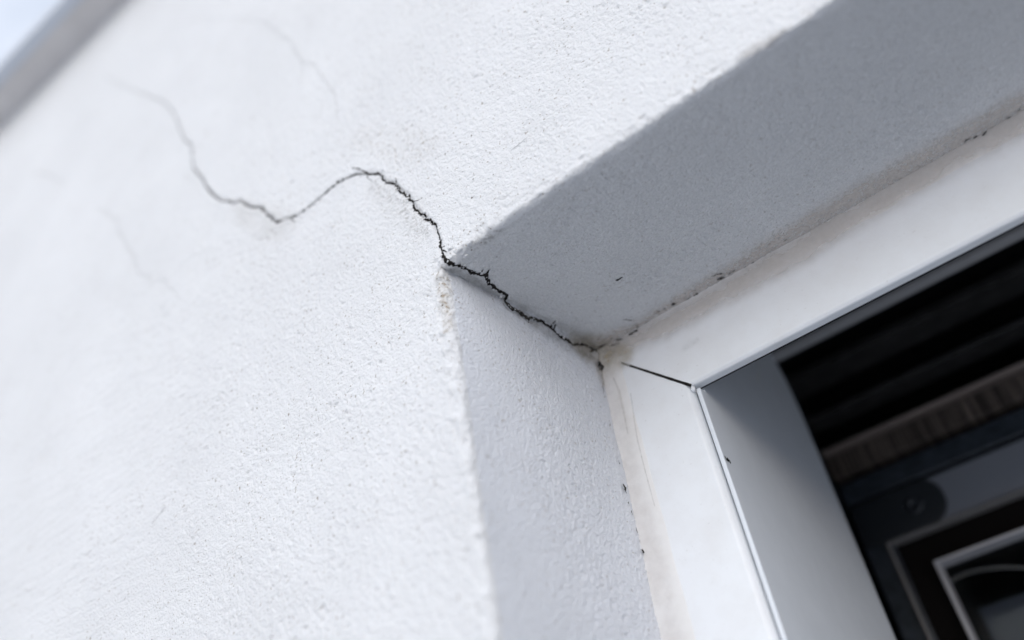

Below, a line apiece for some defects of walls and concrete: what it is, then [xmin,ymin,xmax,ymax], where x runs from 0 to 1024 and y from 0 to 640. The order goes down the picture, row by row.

crack [104,76,787,388]